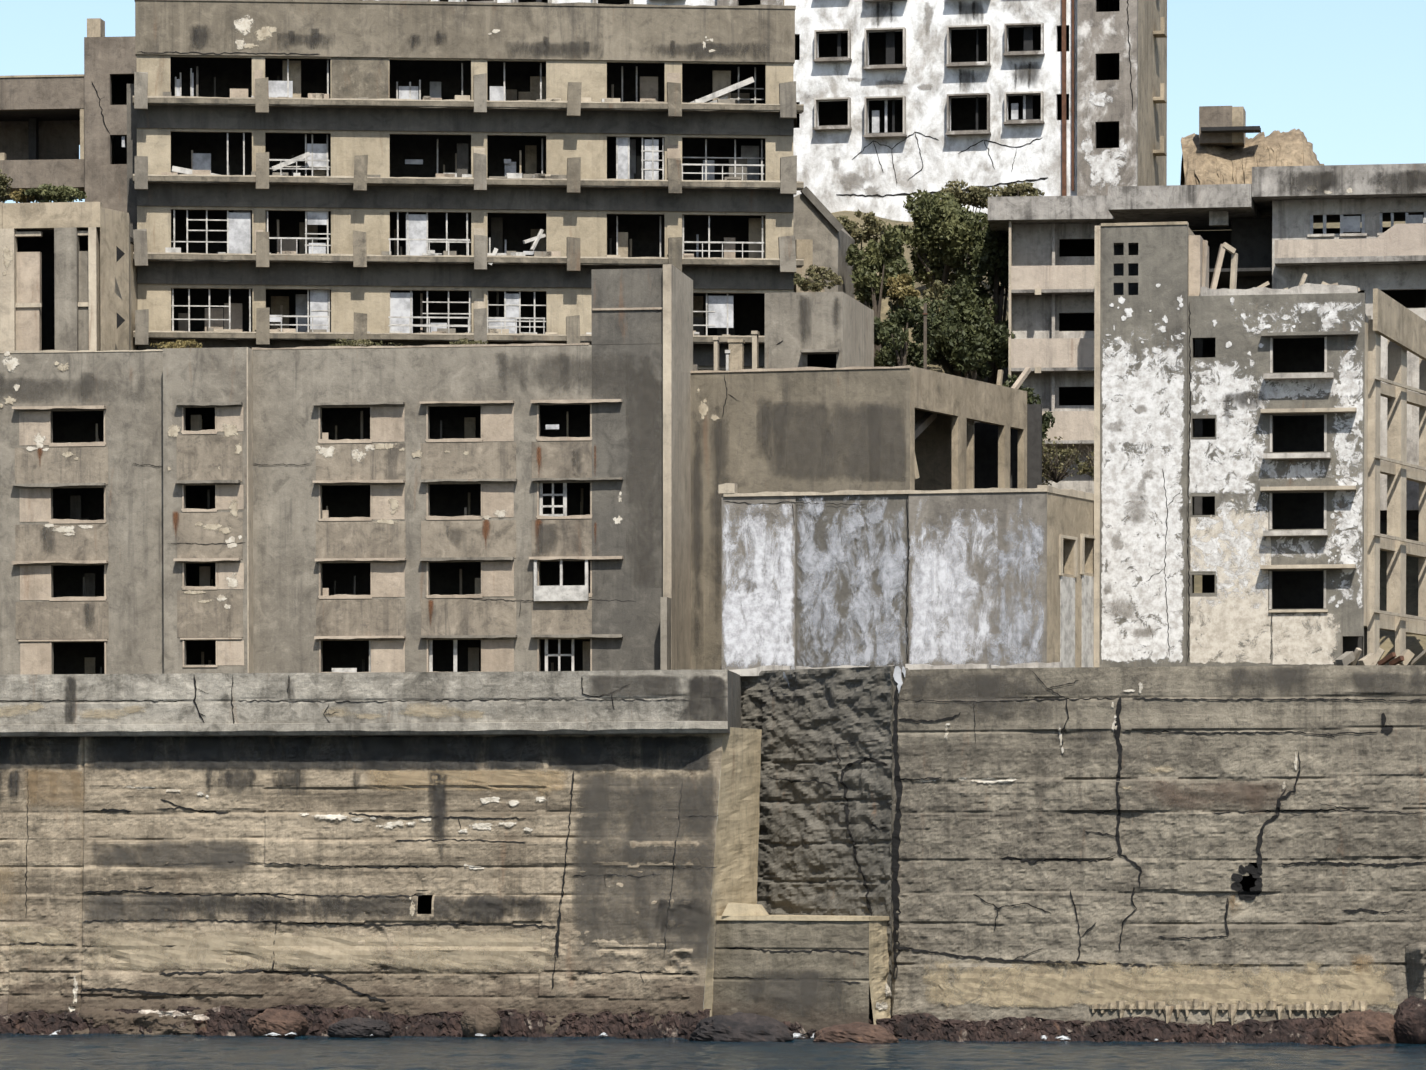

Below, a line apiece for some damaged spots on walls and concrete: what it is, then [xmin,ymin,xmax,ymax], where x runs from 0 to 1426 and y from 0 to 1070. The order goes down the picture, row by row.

crack [836,132,1048,197]
spalling [195,499,242,550]
water stain [0,422,1044,970]
crack [0,496,1426,1002]
water stain [757,403,905,480]
spalling [1111,682,1143,731]
crack [1146,302,1192,660]
peeling [1101,295,1364,665]